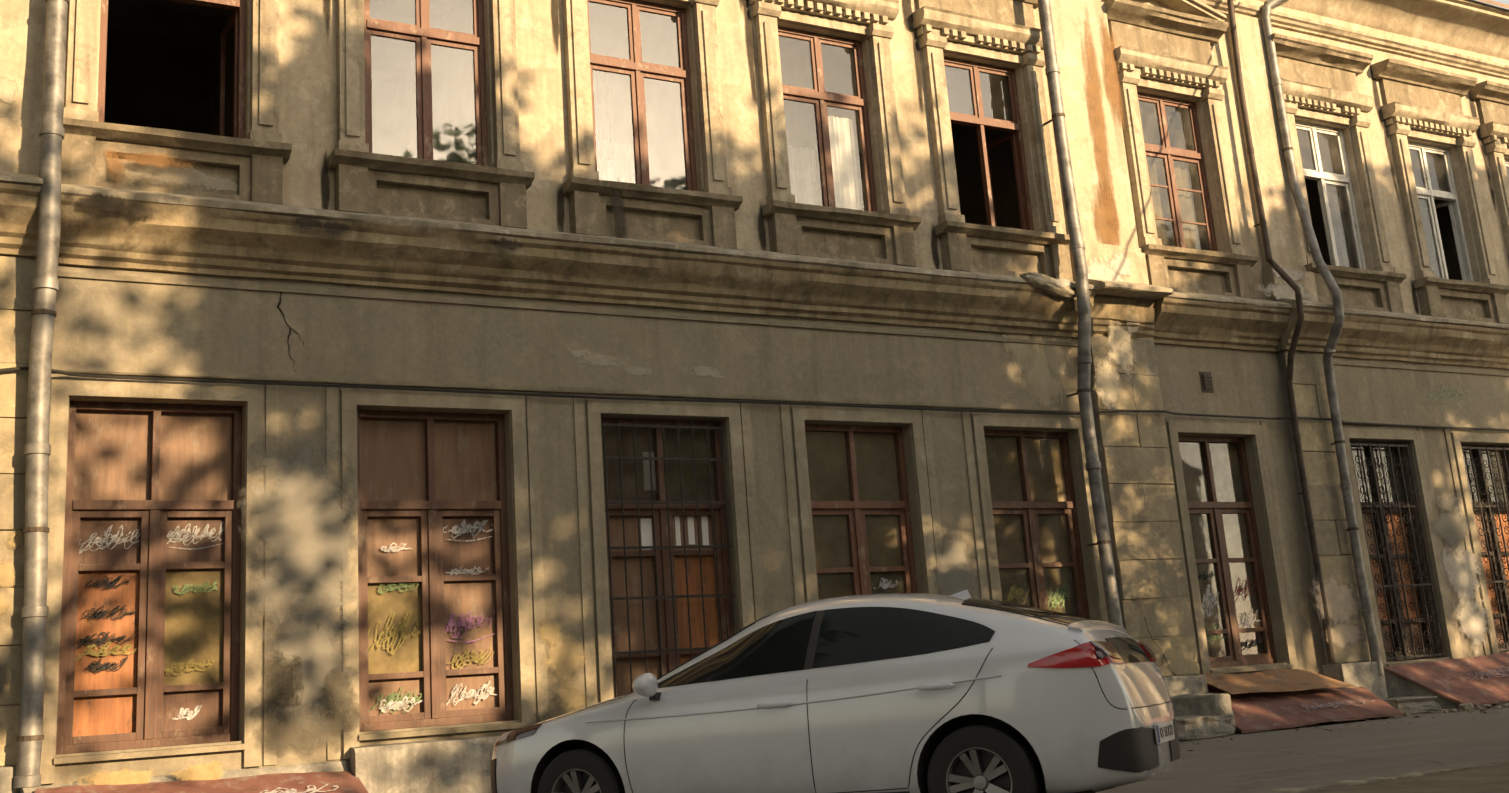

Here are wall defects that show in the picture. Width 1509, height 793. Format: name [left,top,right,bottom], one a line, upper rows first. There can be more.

peeling [1088,254,1132,282]
crack [277,292,304,371]
flaking render [1070,299,1140,410]
peeling [1440,542,1488,654]
water stain [263,657,361,755]